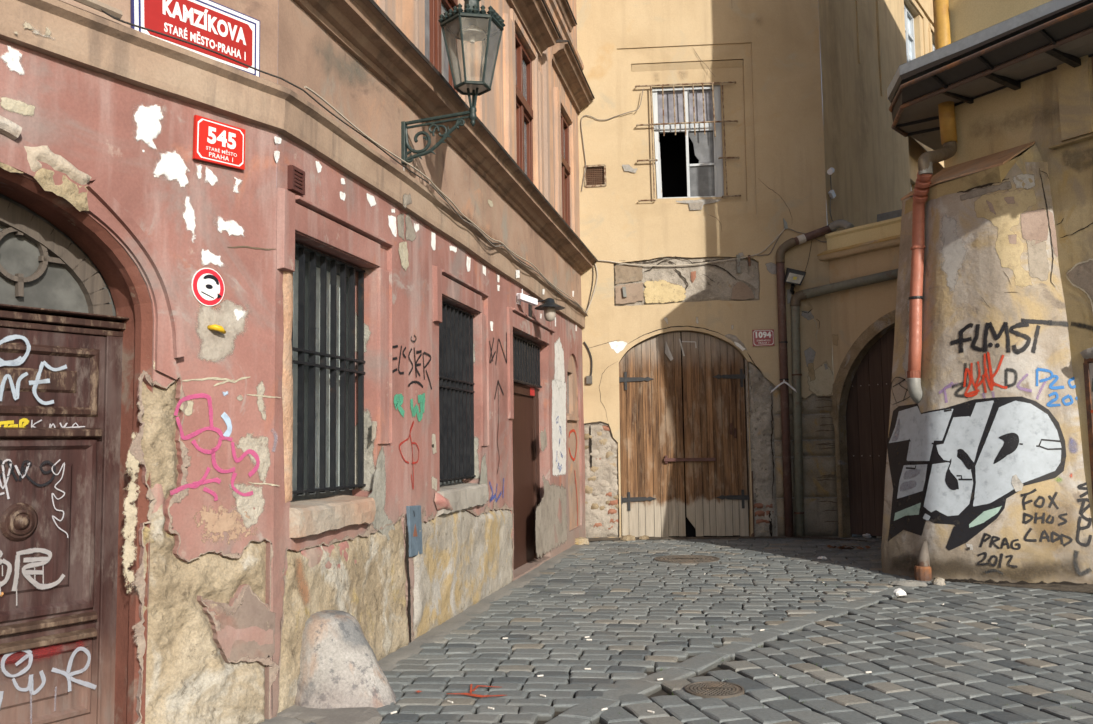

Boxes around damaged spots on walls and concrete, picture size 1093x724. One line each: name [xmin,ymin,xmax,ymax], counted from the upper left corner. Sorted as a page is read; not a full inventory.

flaking render [122,271,514,724]